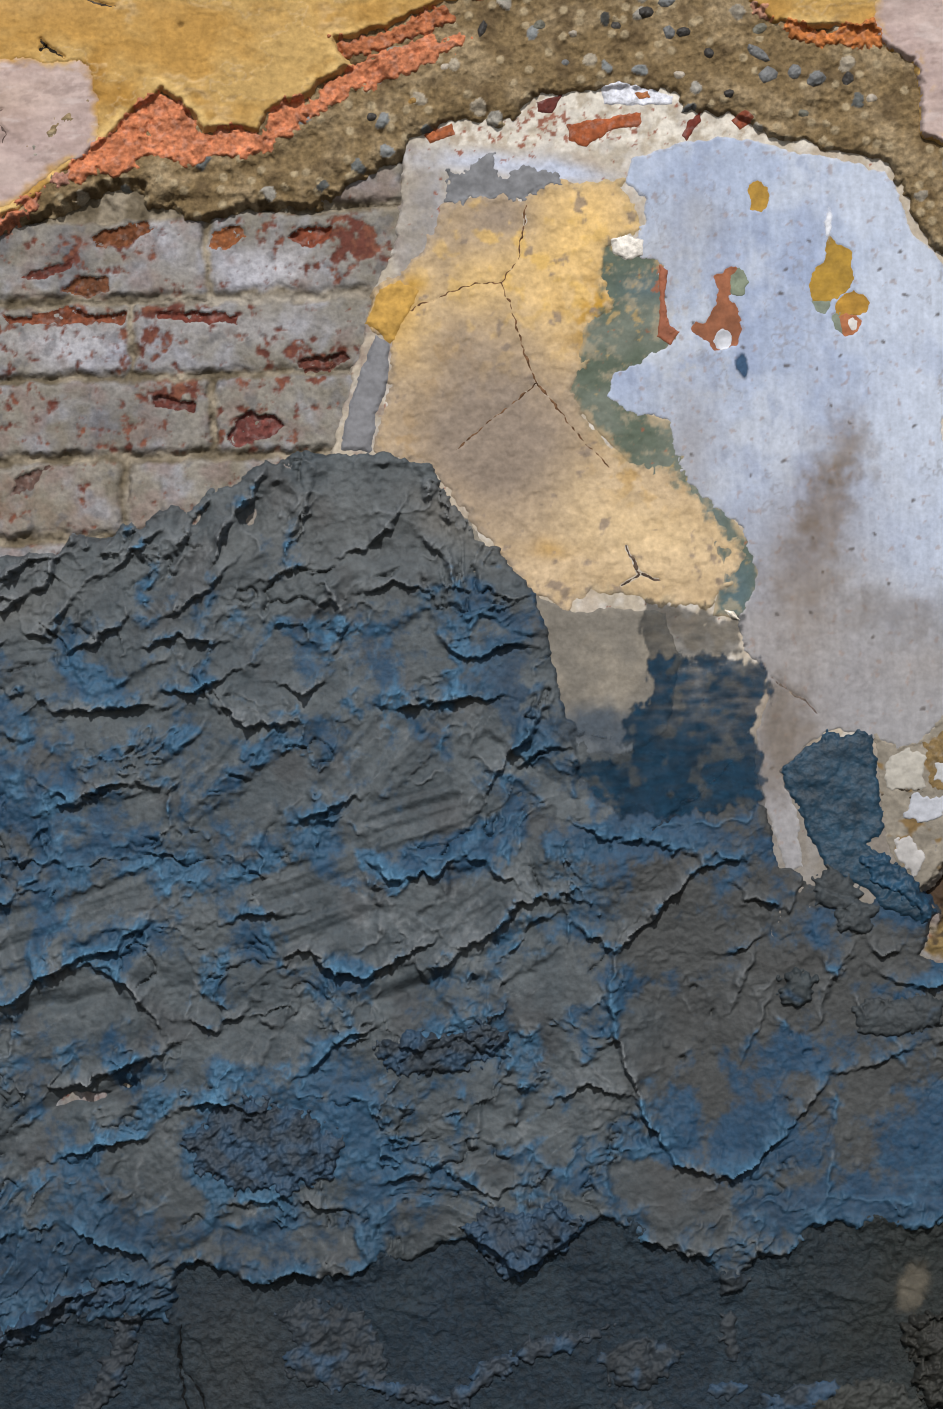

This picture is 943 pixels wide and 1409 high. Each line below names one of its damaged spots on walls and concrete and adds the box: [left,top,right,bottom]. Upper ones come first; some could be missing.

spalling [0,0,943,255]
spalling [2,259,127,327]
spalling [157,310,238,325]
peeling [809,235,870,337]
spalling [152,395,196,413]
spalling [227,410,284,447]
peeling [297,152,758,621]
spalling [10,465,51,496]